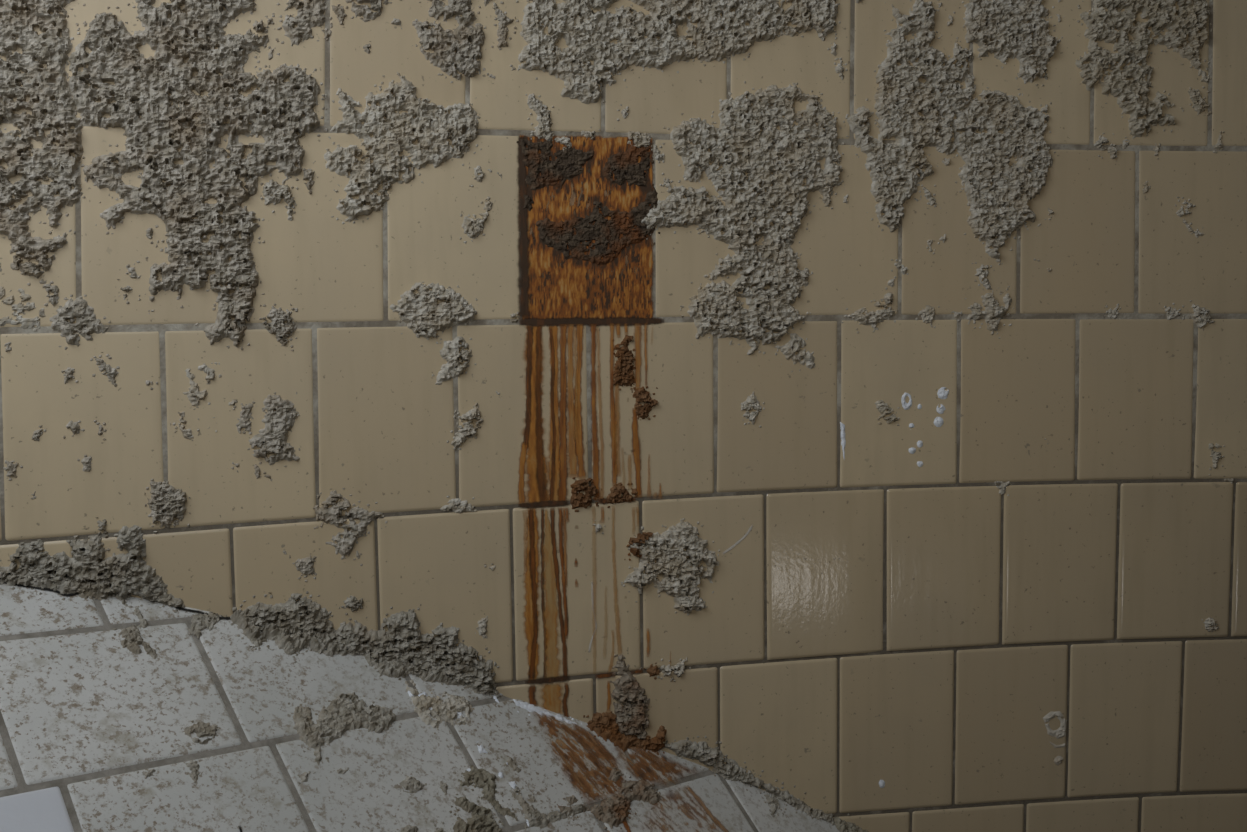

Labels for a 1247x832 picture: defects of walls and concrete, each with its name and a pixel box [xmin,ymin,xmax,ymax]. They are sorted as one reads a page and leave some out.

peeling [320,4,348,41]
peeling [303,168,318,194]
peeling [469,163,502,187]
peeling [39,279,59,307]
peeling [117,261,140,304]
rust [516,127,729,832]
peeling [283,550,317,581]
peeling [339,596,367,615]